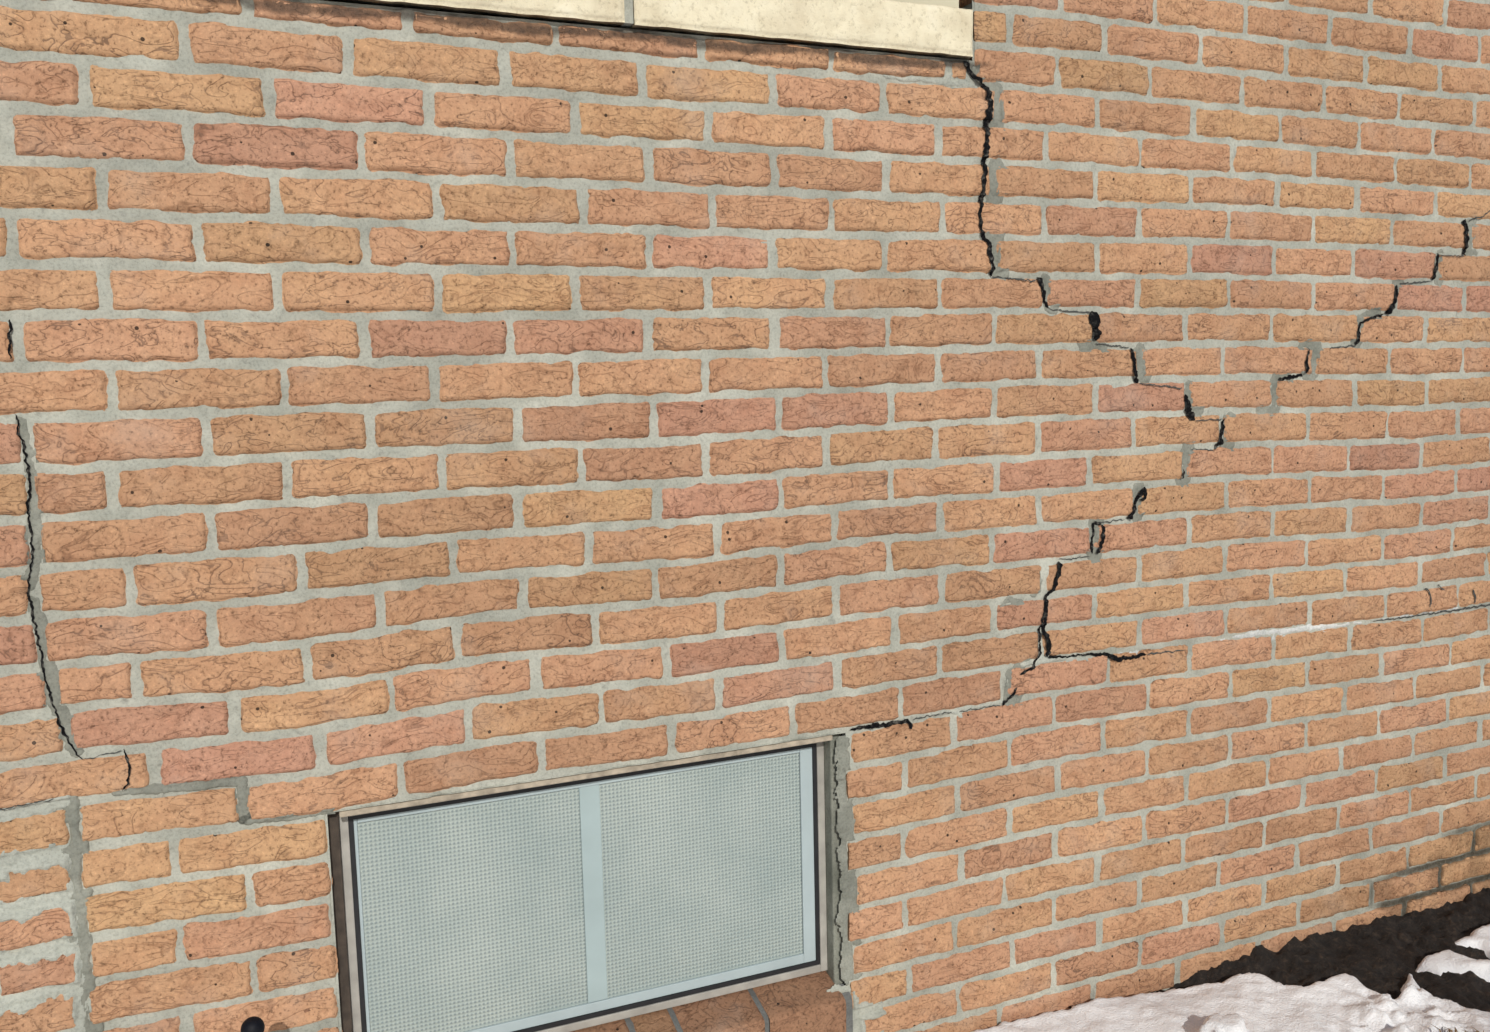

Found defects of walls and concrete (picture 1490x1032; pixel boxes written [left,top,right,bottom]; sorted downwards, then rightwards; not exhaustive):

crack [6,319,14,359]
crack [850,60,1490,731]
crack [15,415,131,791]